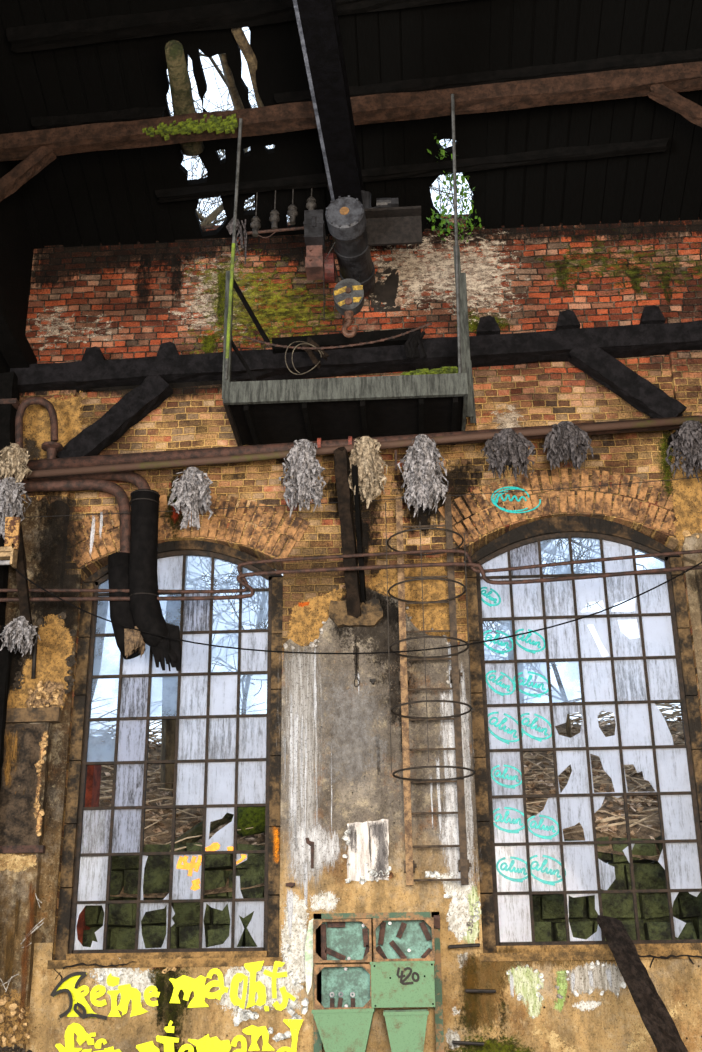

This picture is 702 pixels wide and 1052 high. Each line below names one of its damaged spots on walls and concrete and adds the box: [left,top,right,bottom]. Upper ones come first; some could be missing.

water stain [364,227,530,323]
spalling [7,612,76,710]
spalling [0,724,49,874]
peeling [214,588,394,1042]
efflorescence [287,822,340,934]
peeling [506,960,626,1019]